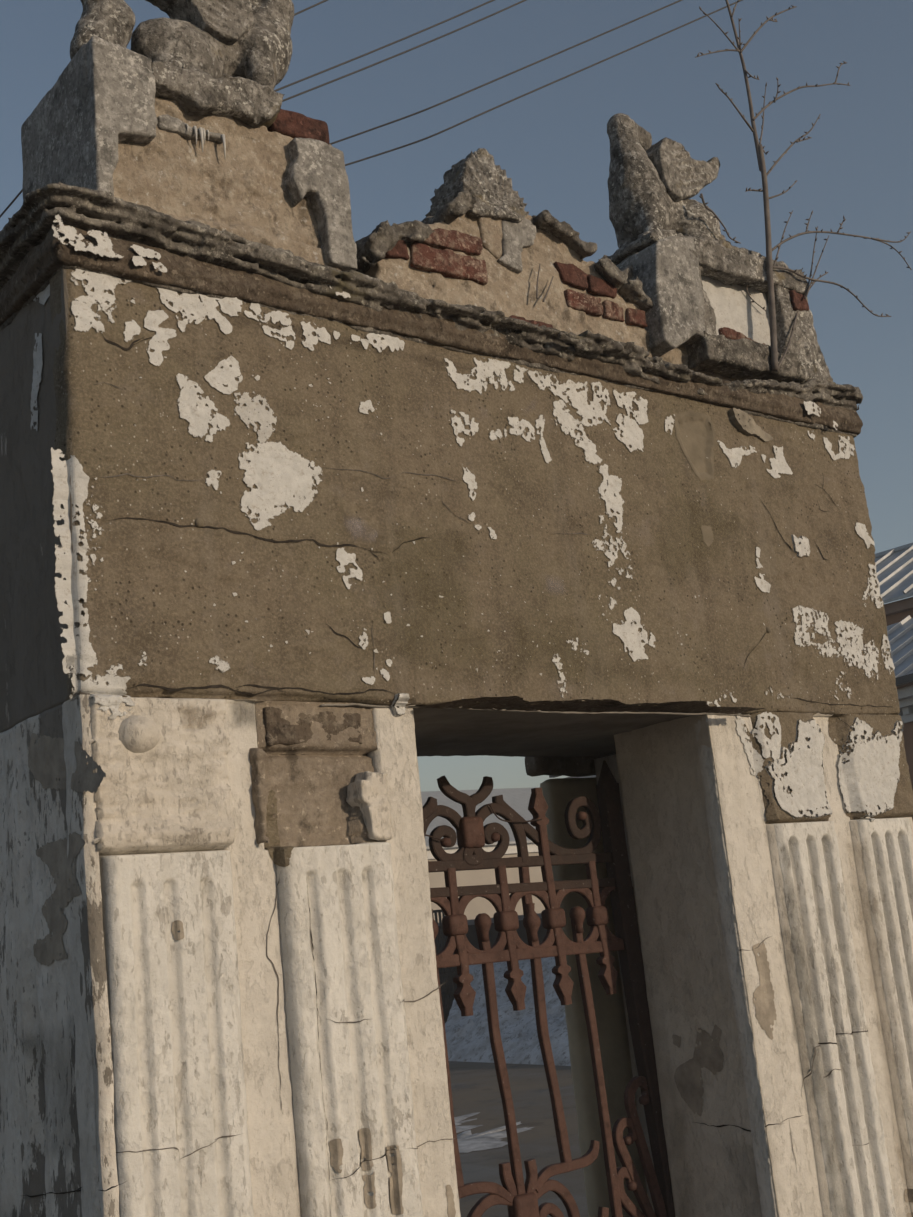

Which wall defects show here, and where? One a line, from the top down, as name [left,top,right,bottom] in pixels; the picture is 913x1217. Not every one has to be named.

peeling [52,214,167,273]
peeling [71,269,405,366]
peeling [51,447,135,720]
peeling [176,356,322,530]
crack [106,517,429,561]
peeling [445,357,656,661]
spalling [665,408,793,481]
peeling [390,605,905,822]
crack [23,1183,123,1198]
crack [116,1134,240,1159]
crack [266,872,457,1213]
crack [696,1031,868,1169]